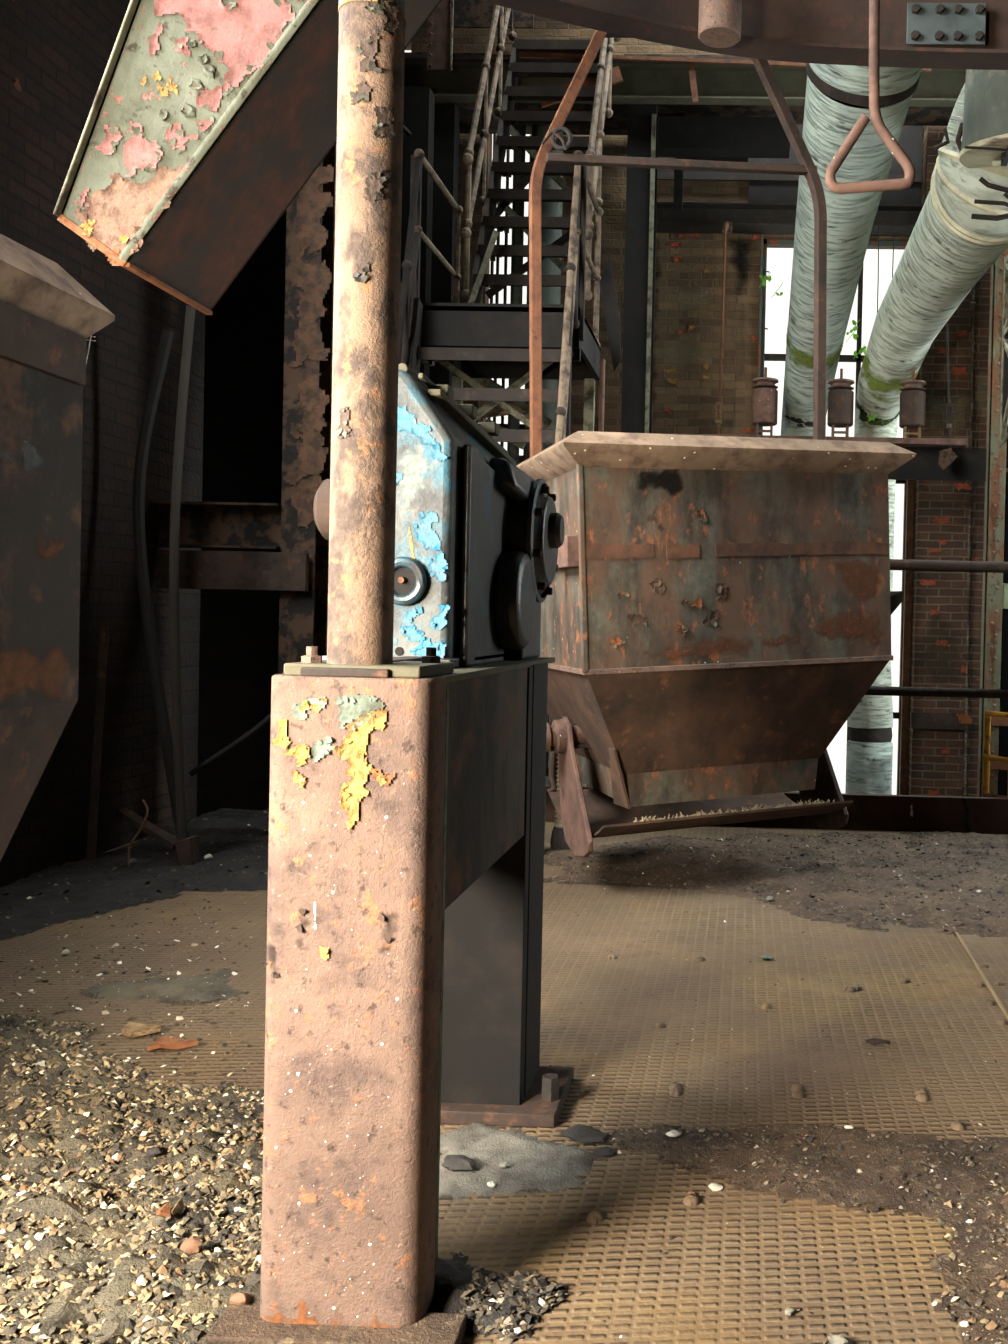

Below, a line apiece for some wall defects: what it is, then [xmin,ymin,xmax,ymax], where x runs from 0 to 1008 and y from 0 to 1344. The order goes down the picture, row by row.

peeling [95,0,295,178]
peeling [74,188,95,236]
peeling [272,693,395,830]
corrosion [262,1302,339,1326]